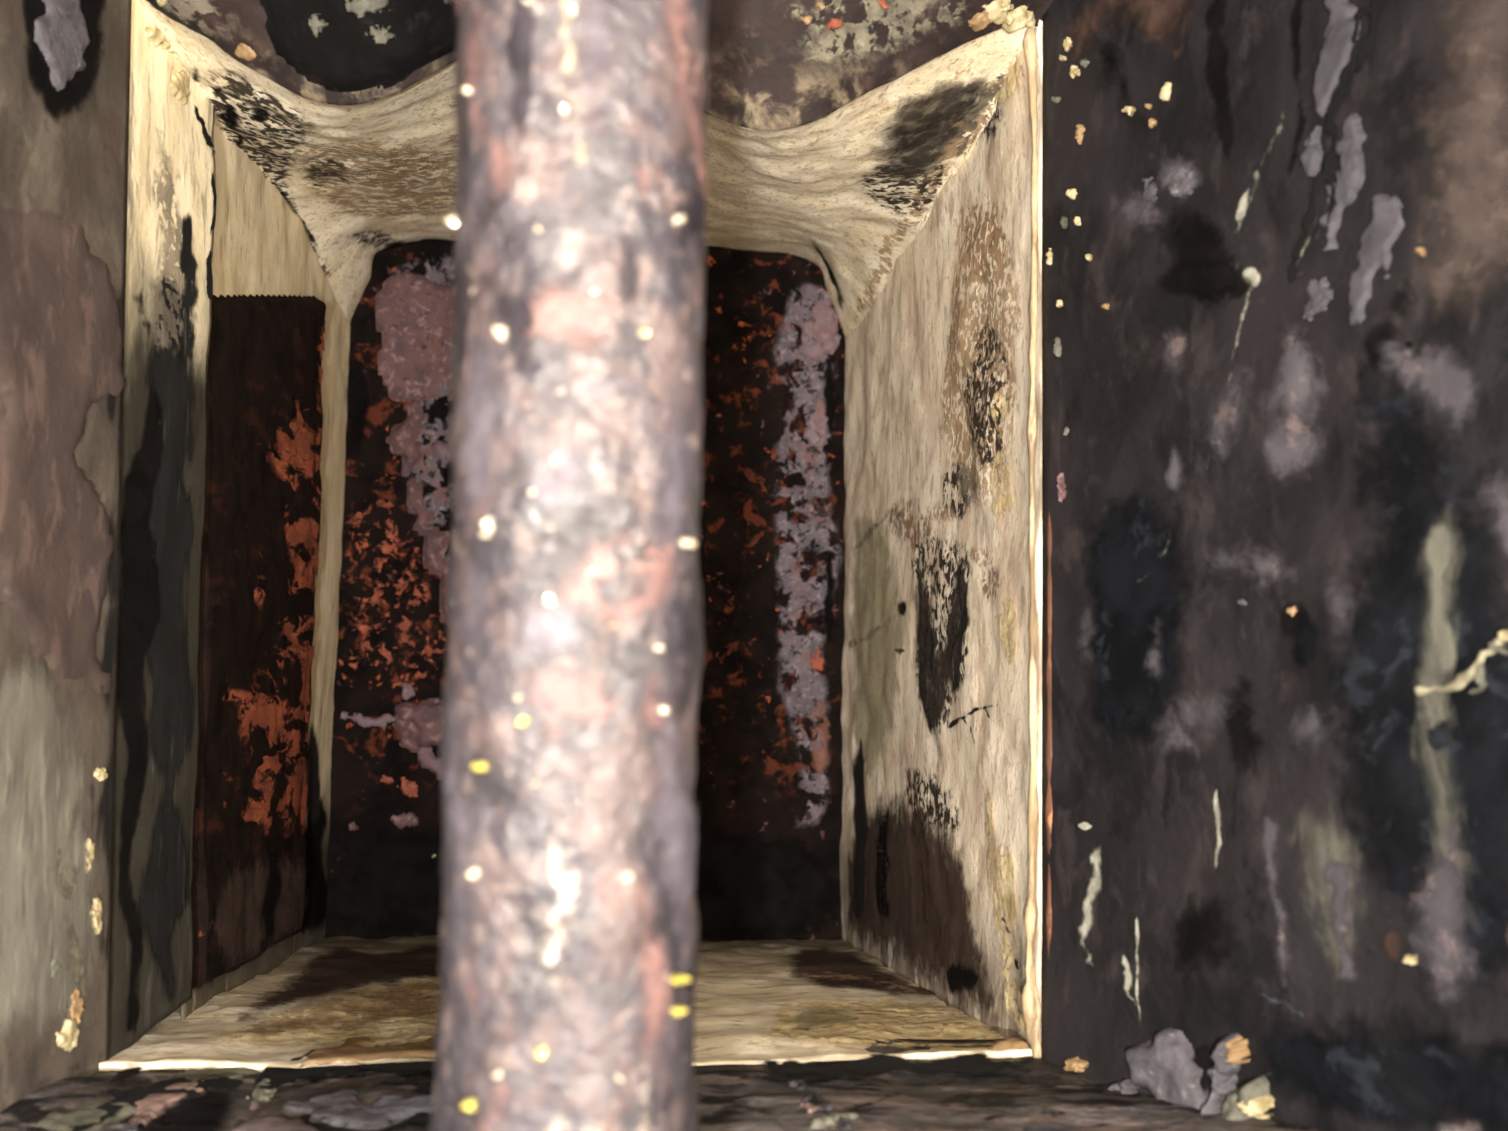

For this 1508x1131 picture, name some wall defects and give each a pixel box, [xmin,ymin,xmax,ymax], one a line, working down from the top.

peeling [23,0,105,119]
peeling [345,0,396,45]
corrosion [268,329,324,595]
corrosion [300,0,709,1131]
corrosion [223,615,315,835]
peeling [340,711,395,728]
corrosion [812,704,829,773]
leakage [1385,525,1475,998]
leakage [853,742,890,919]
leakage [1079,849,1101,962]
leakage [1122,918,1140,1012]
peeling [1201,1033,1272,1120]